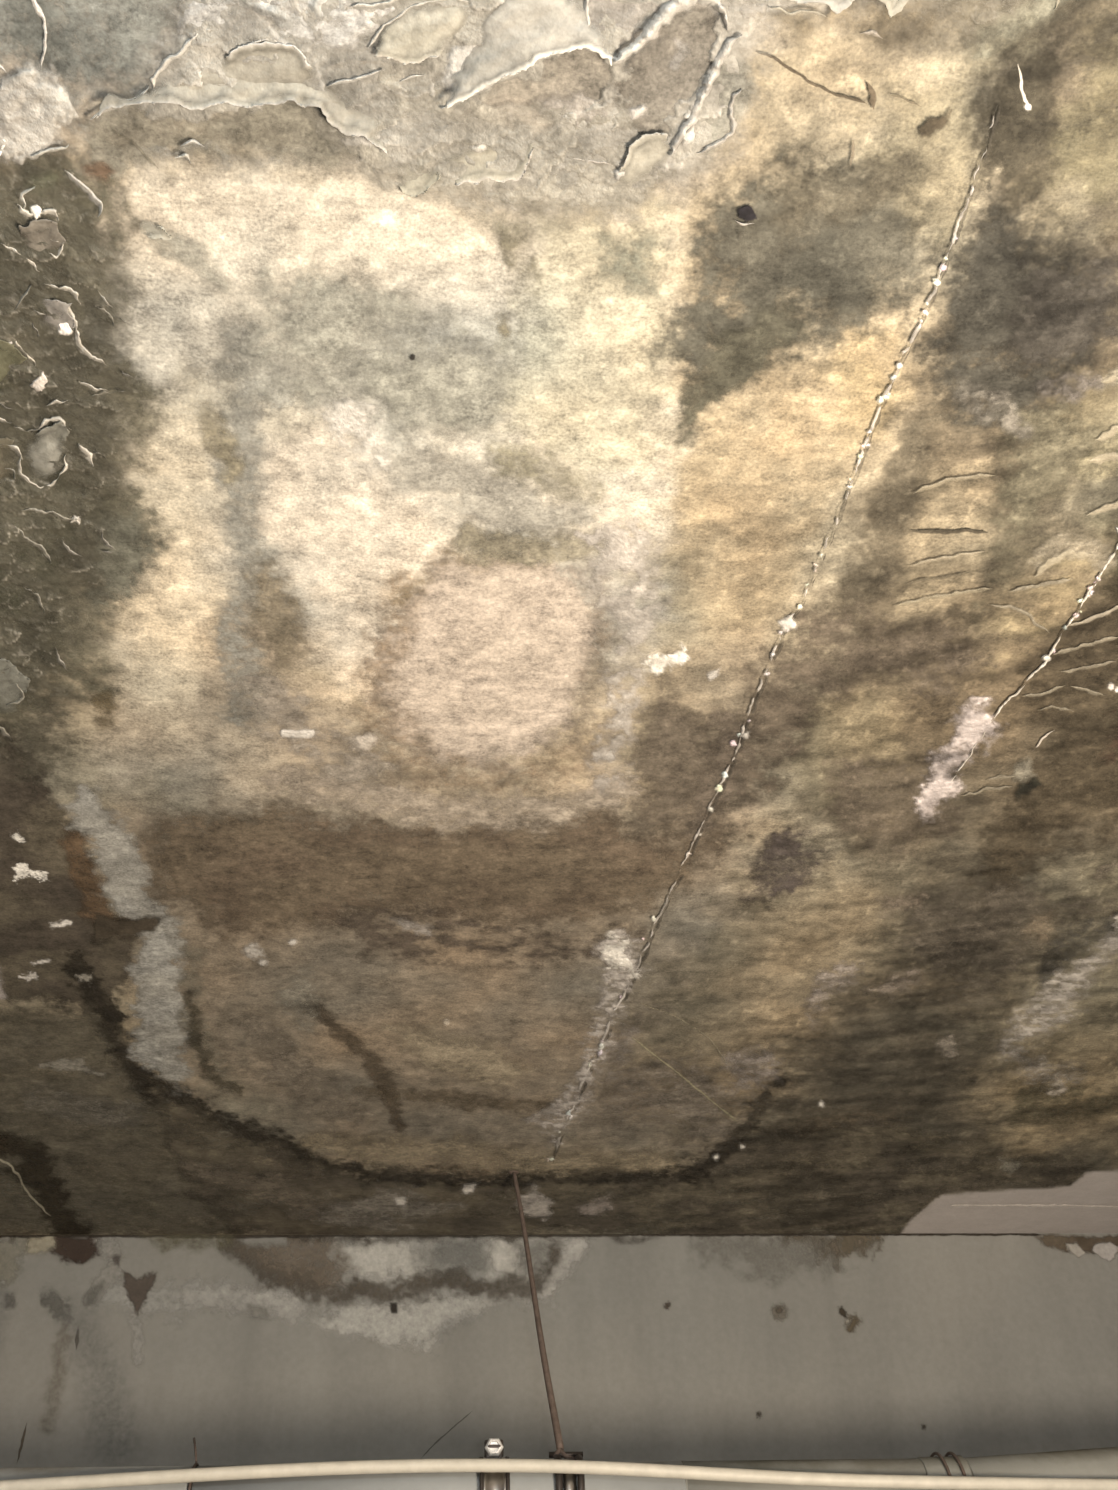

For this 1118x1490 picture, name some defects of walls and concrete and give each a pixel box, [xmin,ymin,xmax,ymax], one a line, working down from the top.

water stain [14,265,110,375]
water stain [0,345,172,727]
water stain [0,0,395,249]
water stain [188,276,601,761]
peeling [0,0,1022,741]
water stain [482,197,655,292]
crack [548,110,1000,1163]
water stain [649,155,933,443]
water stain [841,0,1118,619]
crack [951,528,1118,781]
water stain [0,519,1118,1352]